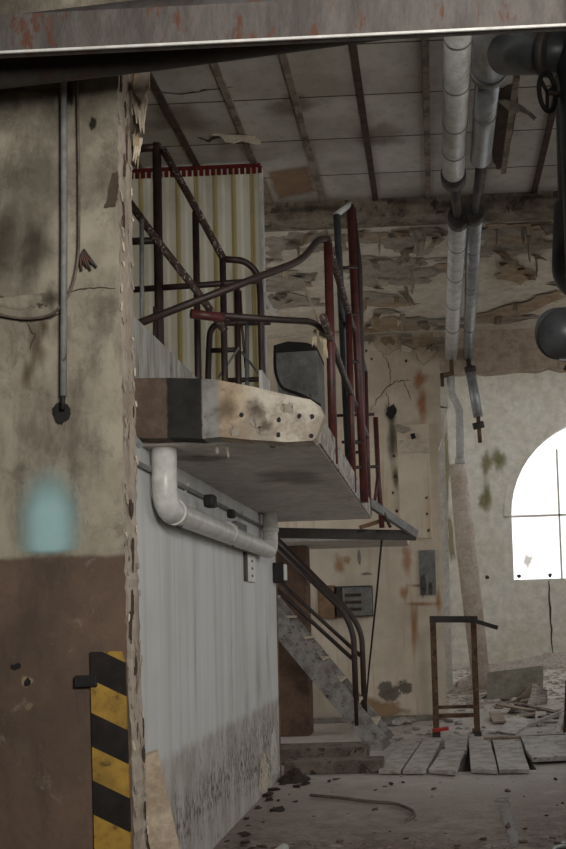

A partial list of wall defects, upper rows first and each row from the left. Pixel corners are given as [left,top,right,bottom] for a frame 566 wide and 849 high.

peeling [104,72,150,251]
peeling [265,230,348,311]
peeling [358,226,448,365]
peeling [480,222,553,286]
peeling [476,283,564,325]
crack [371,354,411,409]
peeling [125,455,140,576]
peeling [128,589,141,645]
peeling [132,702,147,772]
peeling [135,785,149,849]